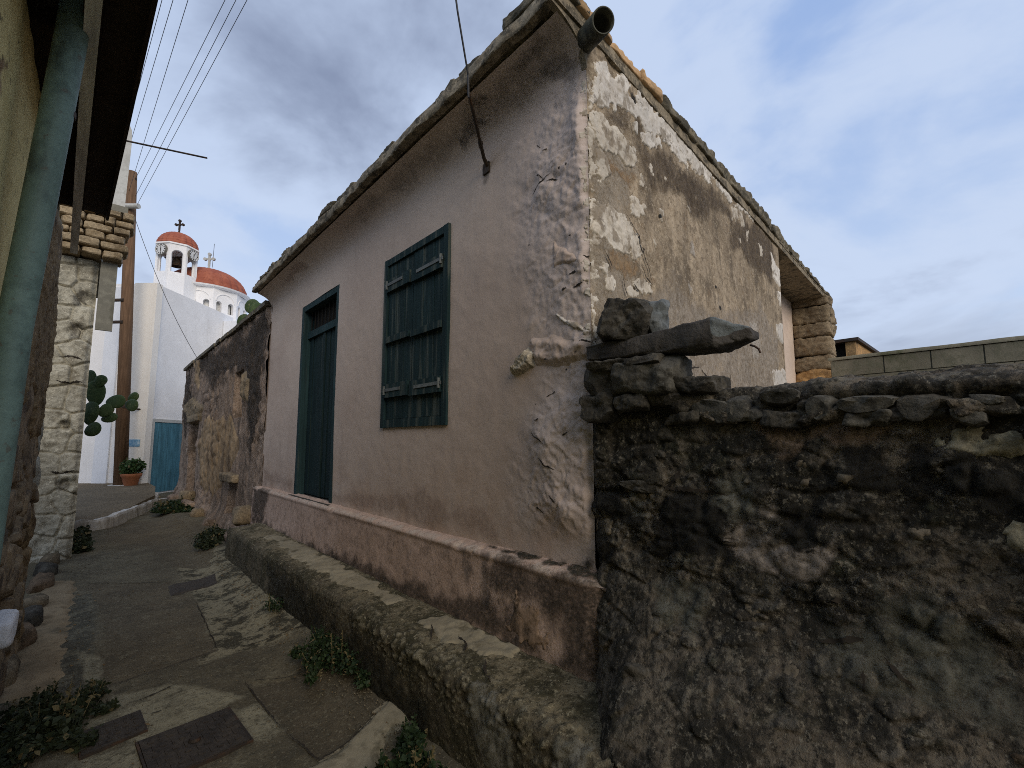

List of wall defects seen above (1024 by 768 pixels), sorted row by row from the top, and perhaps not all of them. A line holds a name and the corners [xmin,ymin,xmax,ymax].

damp [592,240,640,308]
flaking render [556,61,781,345]
damp [589,141,774,282]
flaking render [772,368,787,385]
damp [252,488,271,528]
damp [301,540,607,682]